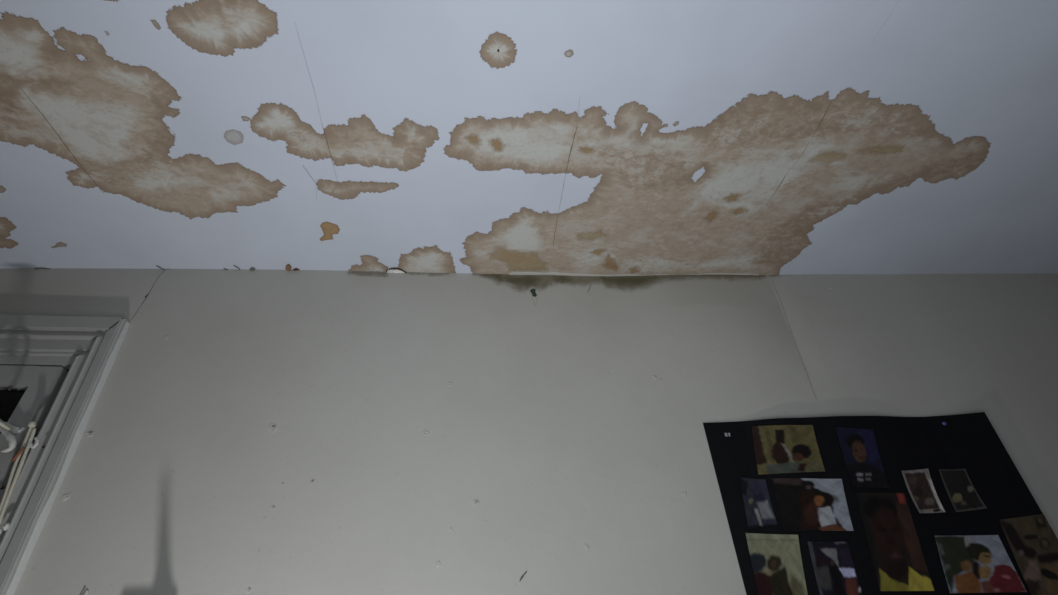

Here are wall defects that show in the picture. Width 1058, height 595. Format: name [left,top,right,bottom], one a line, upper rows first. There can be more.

leakage [151,0,278,57]
leakage [480,32,517,69]
leakage [0,12,286,220]
leakage [242,88,991,289]
leakage [0,217,18,249]